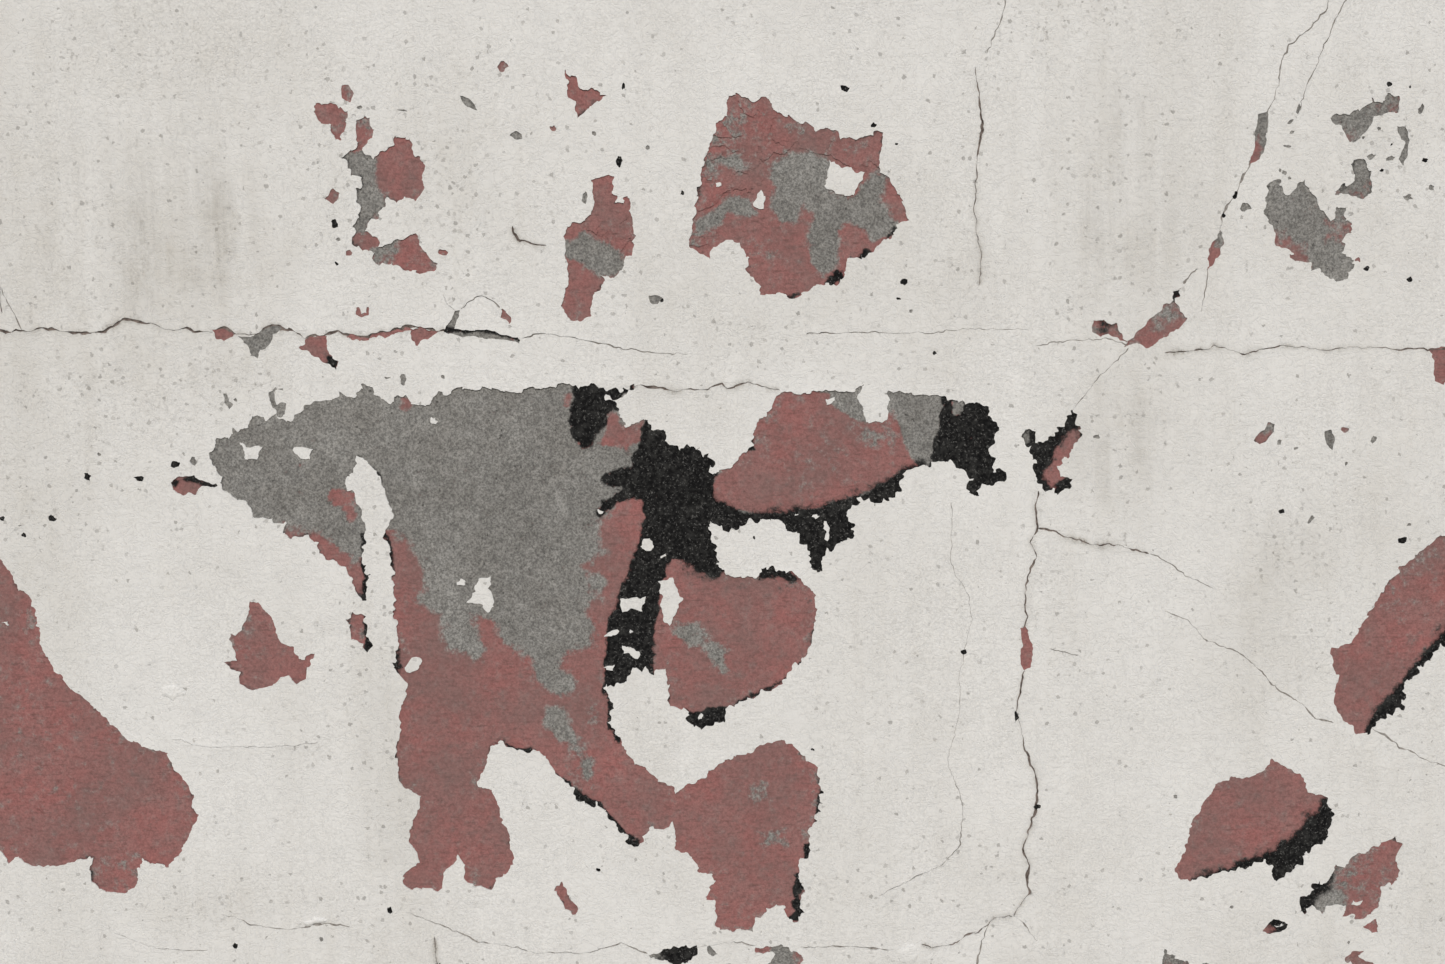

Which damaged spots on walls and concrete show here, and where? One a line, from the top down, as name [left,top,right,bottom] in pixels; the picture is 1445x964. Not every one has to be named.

peeling [314,85,448,274]
crack [0,290,779,392]
crack [512,226,546,246]
peeling [680,93,908,299]
crack [973,0,1006,284]
crack [1183,0,1346,312]
crack [1165,345,1445,355]
peeling [0,559,198,893]
peeling [171,374,1007,932]
crack [922,491,1212,964]
peeling [1175,759,1334,881]
peeling [1330,523,1445,735]